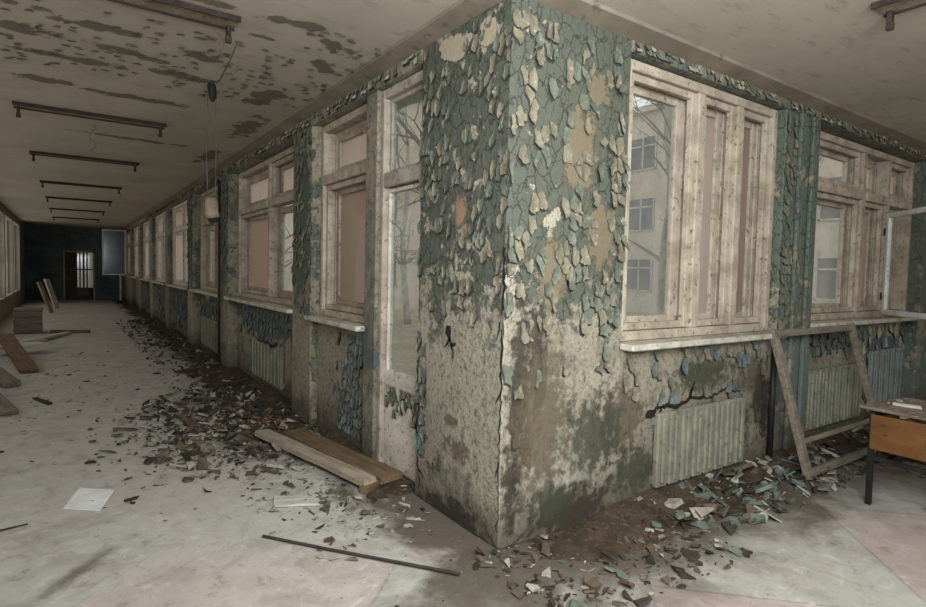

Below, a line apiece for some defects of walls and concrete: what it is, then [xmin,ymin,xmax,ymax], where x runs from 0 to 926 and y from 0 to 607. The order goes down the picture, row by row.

peeling [0,0,365,138]
peeling [145,175,228,331]
spalling [236,9,631,377]
peeling [635,41,926,330]
peeling [333,331,364,442]
peeling [384,331,427,458]
peeling [501,364,524,401]
peeling [622,348,691,406]
peeling [704,341,766,395]